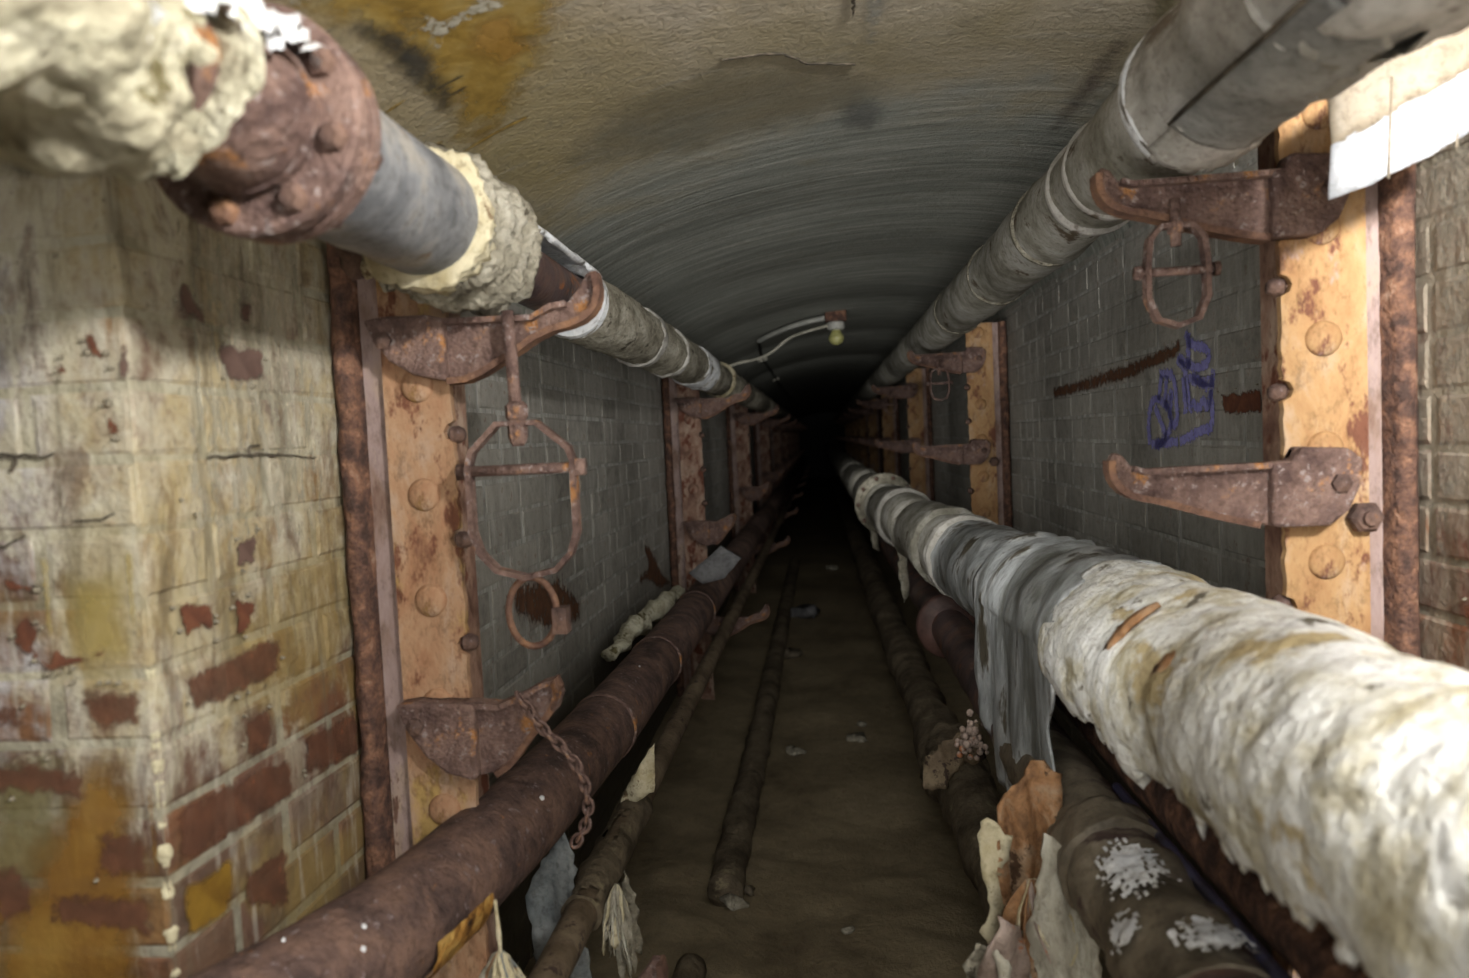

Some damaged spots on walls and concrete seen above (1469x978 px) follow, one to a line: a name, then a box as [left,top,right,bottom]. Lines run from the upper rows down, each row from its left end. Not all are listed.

damp [289,0,558,151]
peeling [173,284,269,389]
peeling [234,527,261,573]
peeling [8,617,140,728]
damp [0,769,60,885]
peeling [0,755,83,801]
peeling [50,831,153,935]
damp [150,731,175,899]
damp [162,925,181,978]
peeling [170,592,357,859]
peeling [246,850,288,907]
corrosion [428,893,494,978]